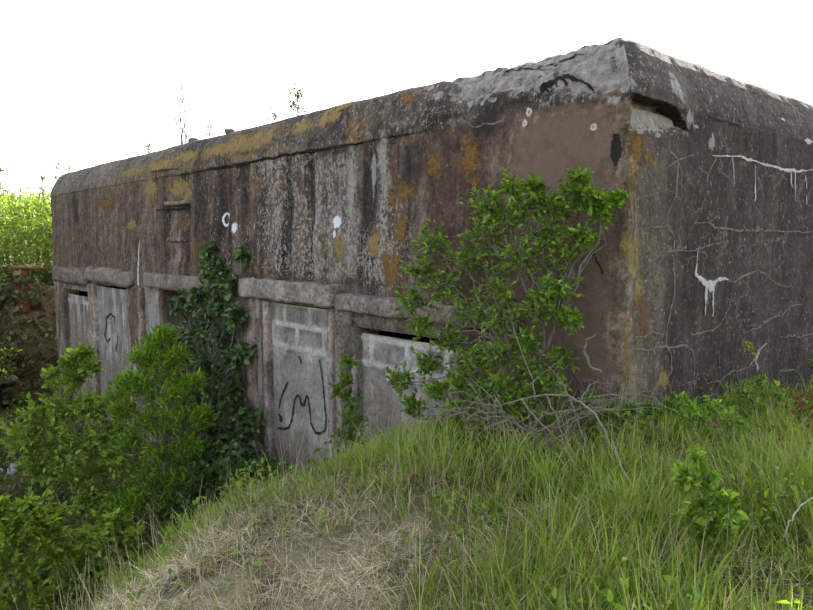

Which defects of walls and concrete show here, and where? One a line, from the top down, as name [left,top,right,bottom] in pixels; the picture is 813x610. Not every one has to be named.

crack [505,54,594,93]
spalling [630,106,698,138]
spalling [669,72,685,101]
damp [348,146,356,227]
damp [362,127,389,227]
crack [630,92,813,398]